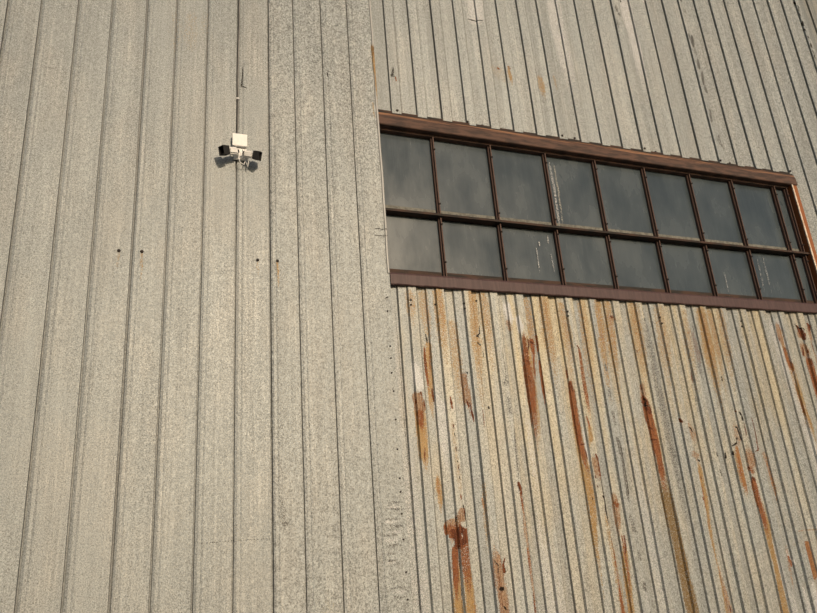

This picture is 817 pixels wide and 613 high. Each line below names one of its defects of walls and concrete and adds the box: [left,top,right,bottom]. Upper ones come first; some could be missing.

corrosion [405,288,495,613]
corrosion [503,296,635,613]
corrosion [625,302,699,613]
corrosion [679,306,735,415]
corrosion [734,445,817,613]
corrosion [775,322,817,450]